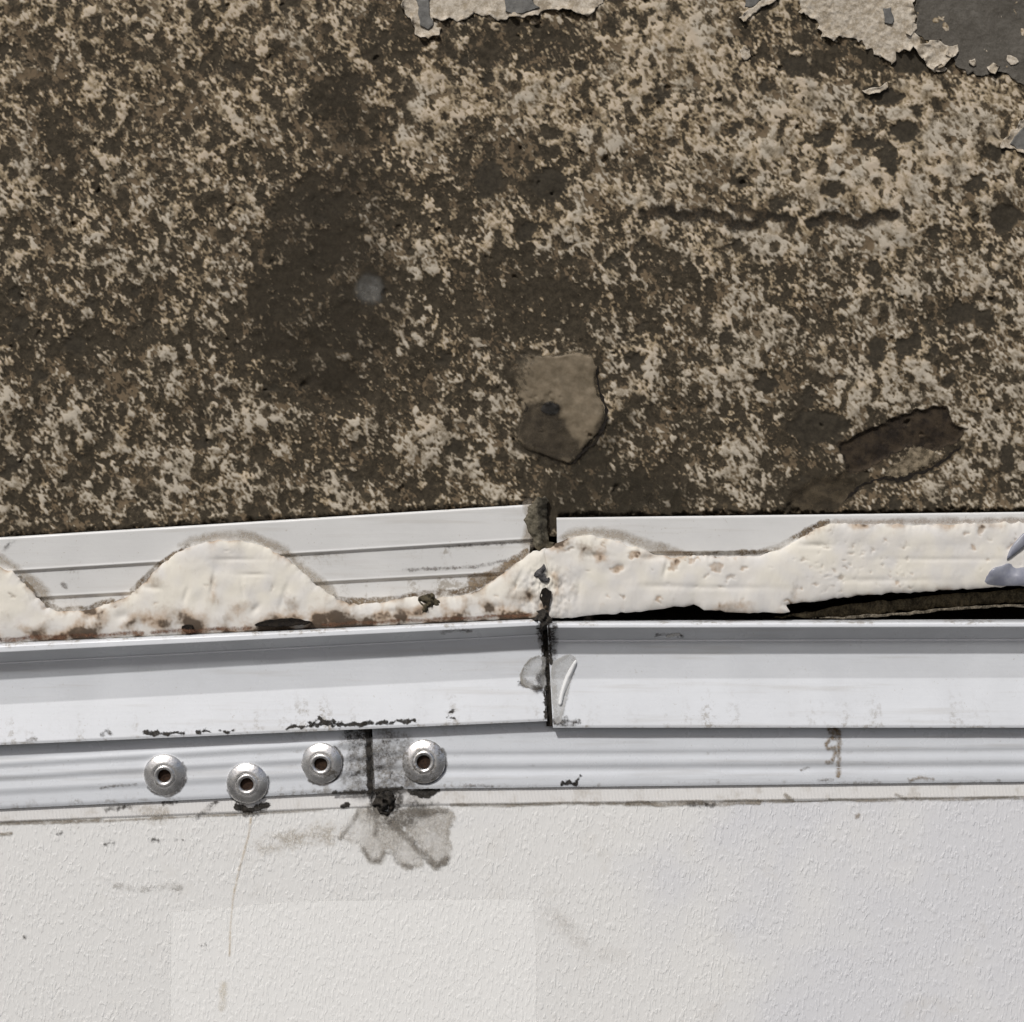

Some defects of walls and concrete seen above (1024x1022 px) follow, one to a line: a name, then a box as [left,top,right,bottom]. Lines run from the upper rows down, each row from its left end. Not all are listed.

peeling [401,0,604,39]
peeling [739,0,776,22]
peeling [740,46,751,60]
peeling [798,0,1024,85]
peeling [862,82,888,95]
spalling [515,352,609,465]
spalling [775,405,968,515]
leakage [143,729,234,737]
leakage [285,716,455,867]